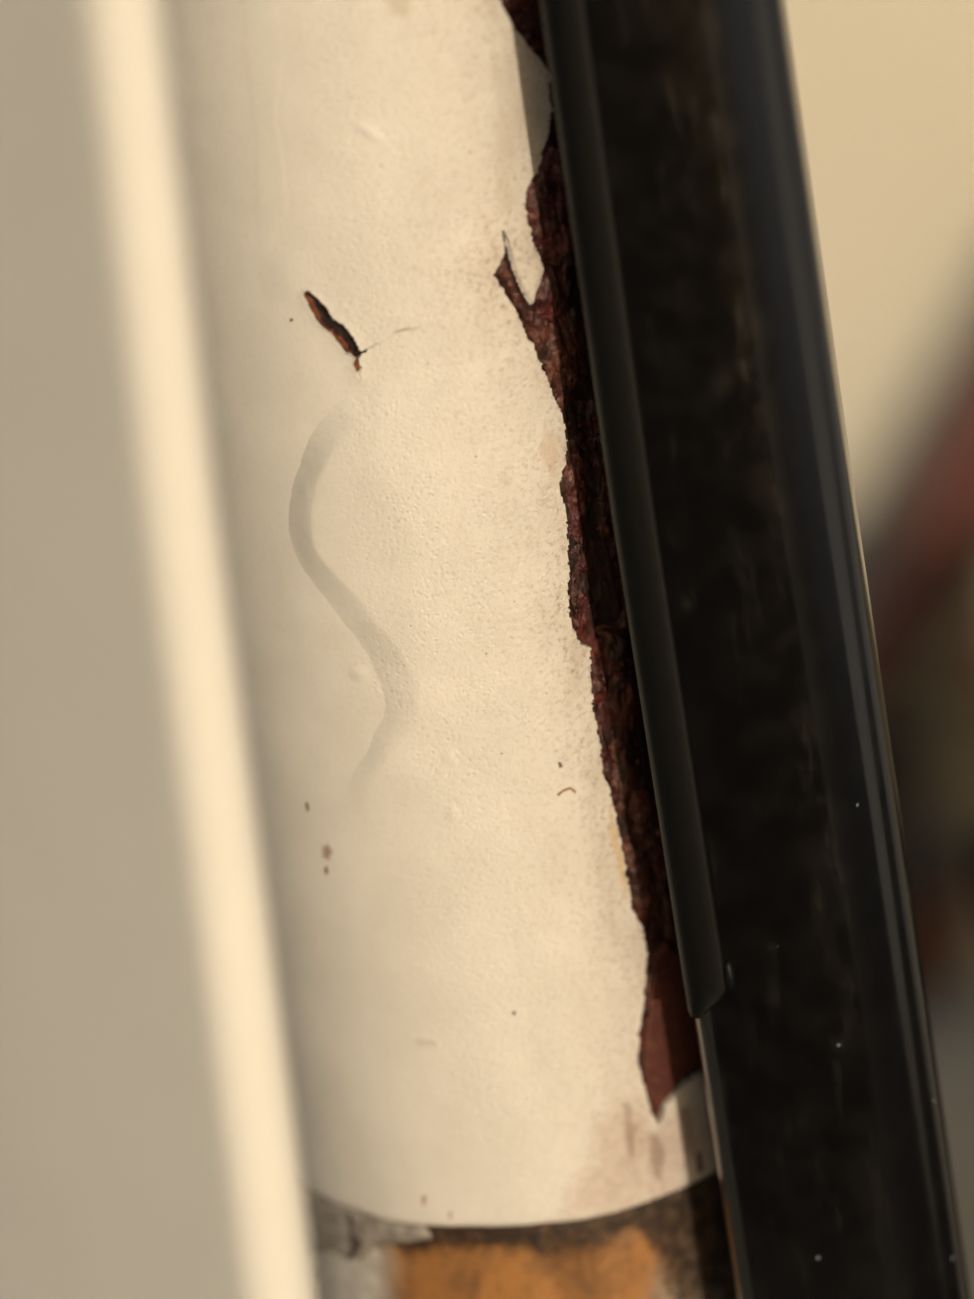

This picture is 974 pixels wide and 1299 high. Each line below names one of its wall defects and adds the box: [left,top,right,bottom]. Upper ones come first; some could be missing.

rust [533,418,565,488]
peeling [493,0,700,1119]
rust [601,798,630,909]
rust [349,1151,725,1299]